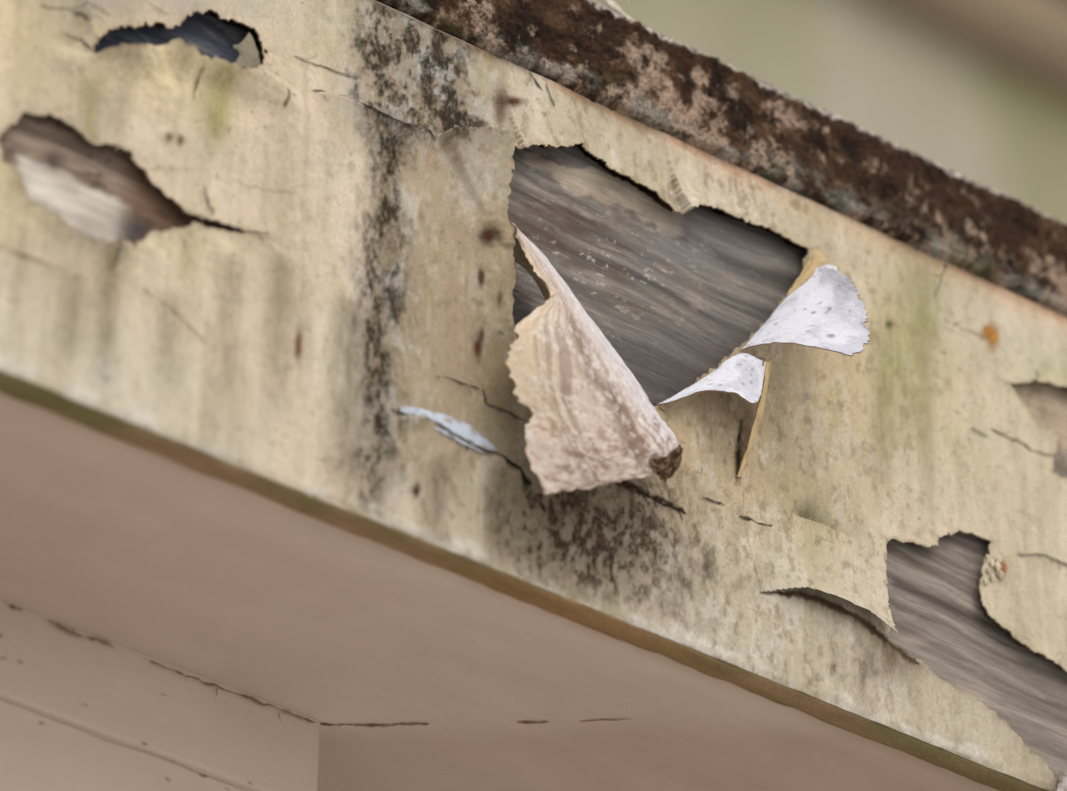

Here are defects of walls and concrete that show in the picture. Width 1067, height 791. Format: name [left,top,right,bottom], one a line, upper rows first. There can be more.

peeling [94,12,261,68]
crack [284,54,436,142]
peeling [0,113,244,245]
damp [354,3,484,500]
peeling [505,145,870,495]
corrosion [984,327,997,344]
crack [736,421,746,478]
peeling [1011,380,1067,477]
damp [503,478,679,596]
crack [615,480,772,526]
crack [150,660,429,727]
peeling [885,531,1067,791]